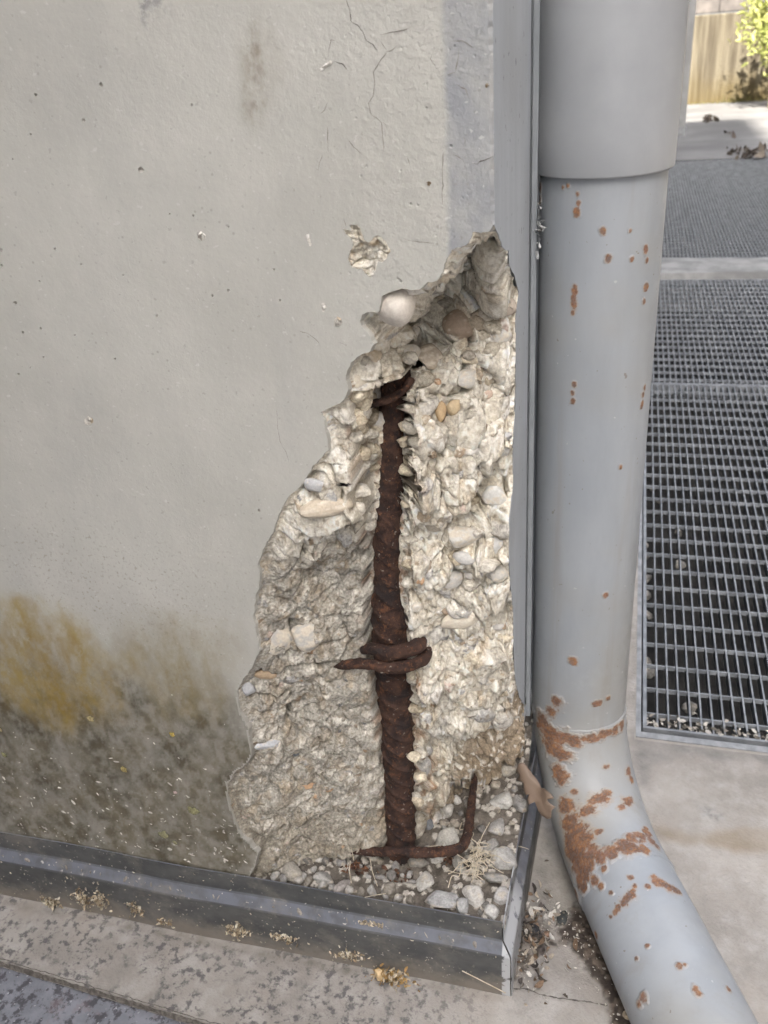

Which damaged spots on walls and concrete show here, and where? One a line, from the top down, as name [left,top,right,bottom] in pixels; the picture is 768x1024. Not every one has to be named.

crack [318,3,407,170]
spalling [213,224,525,891]
peeling [0,732,106,847]
damp [0,703,257,876]
peeling [76,775,210,881]
corrosion [329,859,413,883]